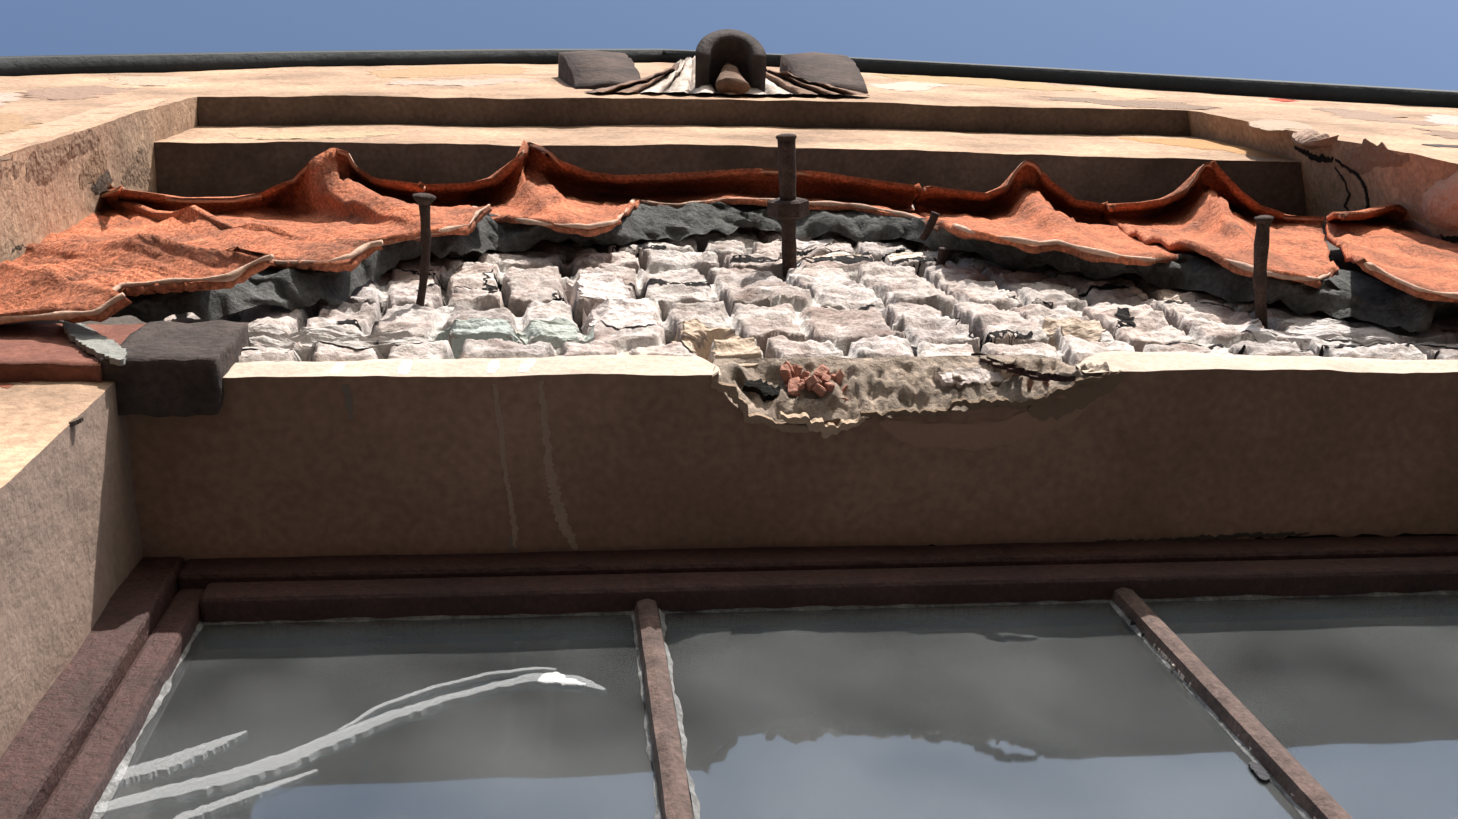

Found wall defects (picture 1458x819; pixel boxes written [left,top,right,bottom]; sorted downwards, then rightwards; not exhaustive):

crack [1294,145,1370,211]
crack [1422,142,1458,150]
crack [1436,235,1458,243]
flaking render [0,198,1458,439]